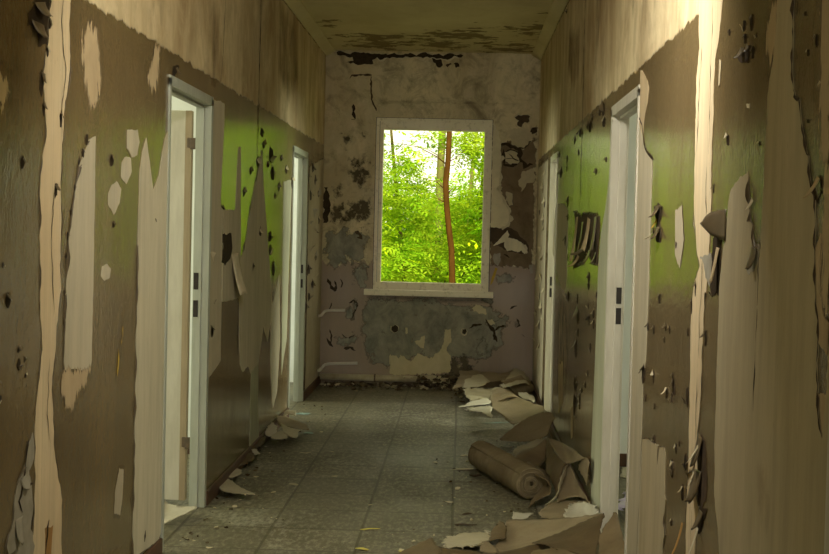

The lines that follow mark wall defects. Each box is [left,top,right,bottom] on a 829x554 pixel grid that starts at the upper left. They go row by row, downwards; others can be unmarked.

peeling [5,0,73,554]
peeling [81,20,101,108]
peeling [108,129,140,228]
peeling [208,100,226,384]
flaking render [305,159,370,389]
flaking render [322,20,543,68]
flaking render [346,296,520,385]
flaking render [490,113,545,285]
peeling [562,180,609,514]
peeling [645,203,662,243]
peeling [661,0,730,554]
peeling [803,0,829,355]